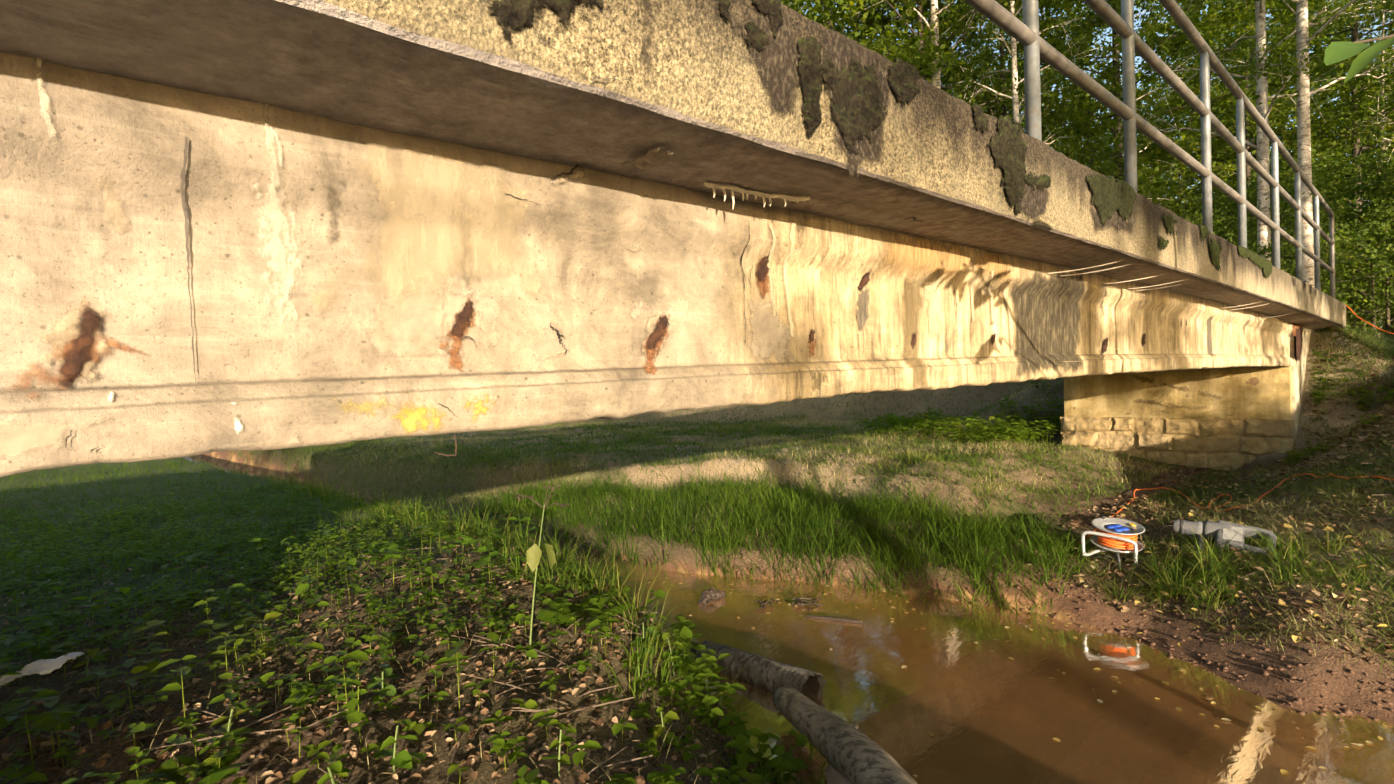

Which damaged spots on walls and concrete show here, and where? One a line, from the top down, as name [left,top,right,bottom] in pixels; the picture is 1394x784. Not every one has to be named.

damp [728,9,800,115]
damp [820,33,890,176]
crack [180,136,196,380]
damp [1018,177,1050,219]
damp [1091,207,1133,232]
damp [971,271,1085,376]
damp [1207,316,1215,356]